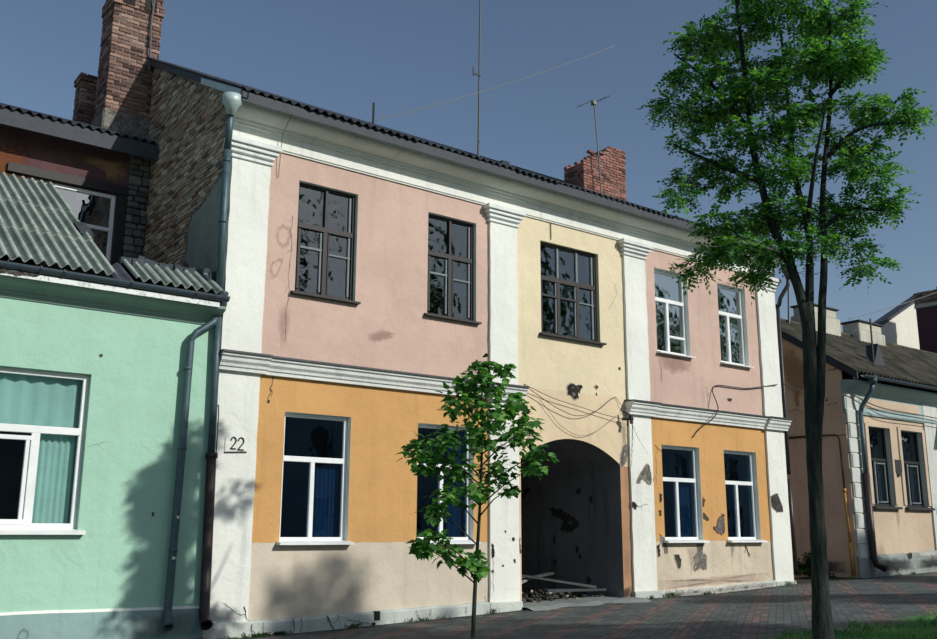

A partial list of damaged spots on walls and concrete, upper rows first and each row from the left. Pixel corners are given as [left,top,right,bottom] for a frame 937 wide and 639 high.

damp [783,352,804,406]
spalling [619,443,628,468]
spalling [636,463,654,485]
spalling [702,496,725,536]
spalling [770,493,783,513]
spalling [656,533,682,570]
spalling [693,543,707,572]